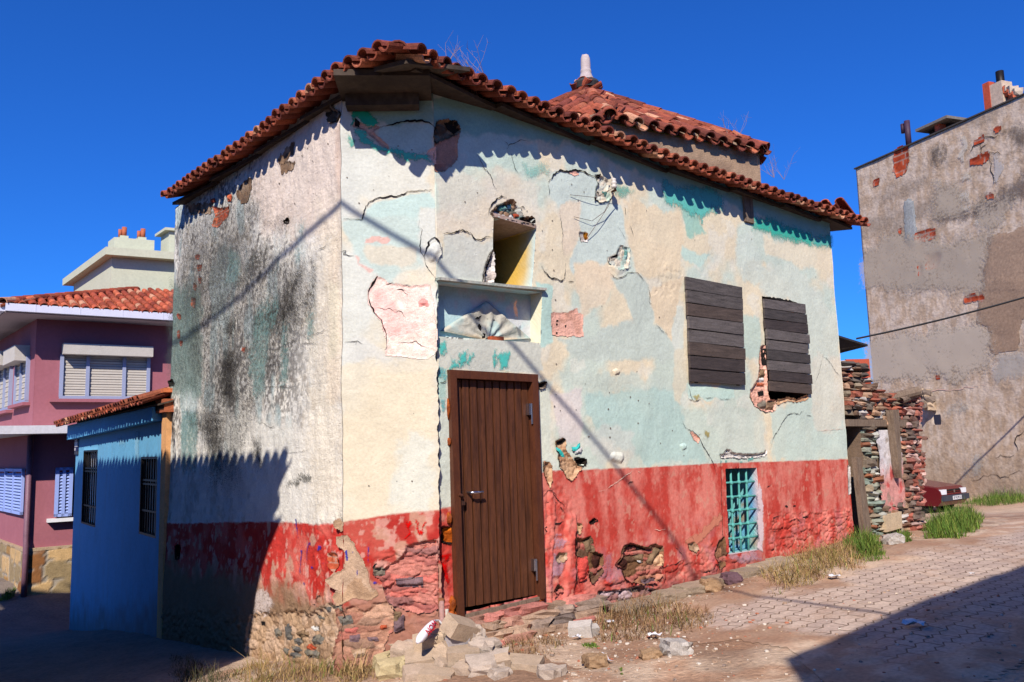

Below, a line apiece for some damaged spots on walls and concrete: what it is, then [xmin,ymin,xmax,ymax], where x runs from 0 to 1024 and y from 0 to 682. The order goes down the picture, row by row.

flaking render [893,145,909,178]
crack [347,189,431,220]
crack [543,169,597,282]
flaking render [607,245,631,270]
mould [164,172,320,505]
peeling [368,276,438,359]
peeling [551,299,584,337]
flaking render [964,293,985,304]
flaking render [750,345,808,412]
flaking render [543,436,590,488]
flaking render [720,449,767,459]
peeling [300,518,378,606]